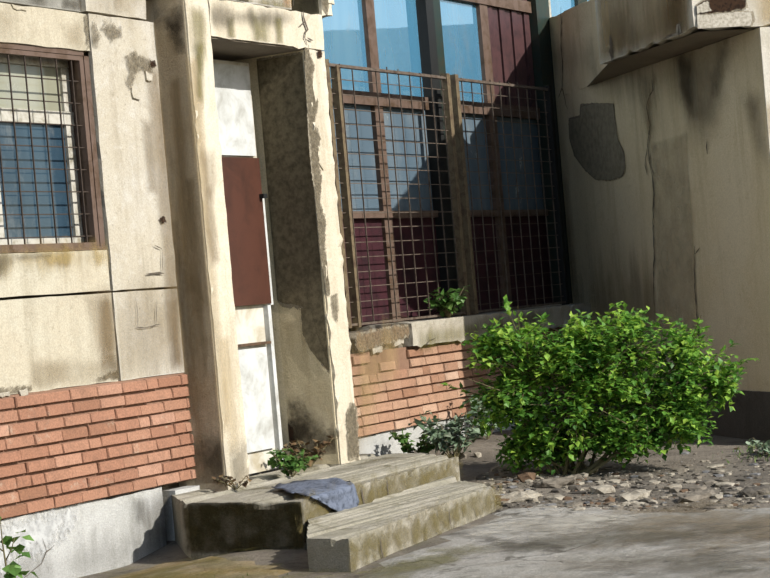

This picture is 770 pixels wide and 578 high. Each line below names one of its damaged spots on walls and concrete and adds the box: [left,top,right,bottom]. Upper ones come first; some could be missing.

crack [293,0,313,44]
spalling [696,0,755,29]
spalling [126,51,156,100]
peeling [257,45,339,374]
crack [645,84,655,306]
damp [288,406,336,455]
spalling [346,403,359,460]